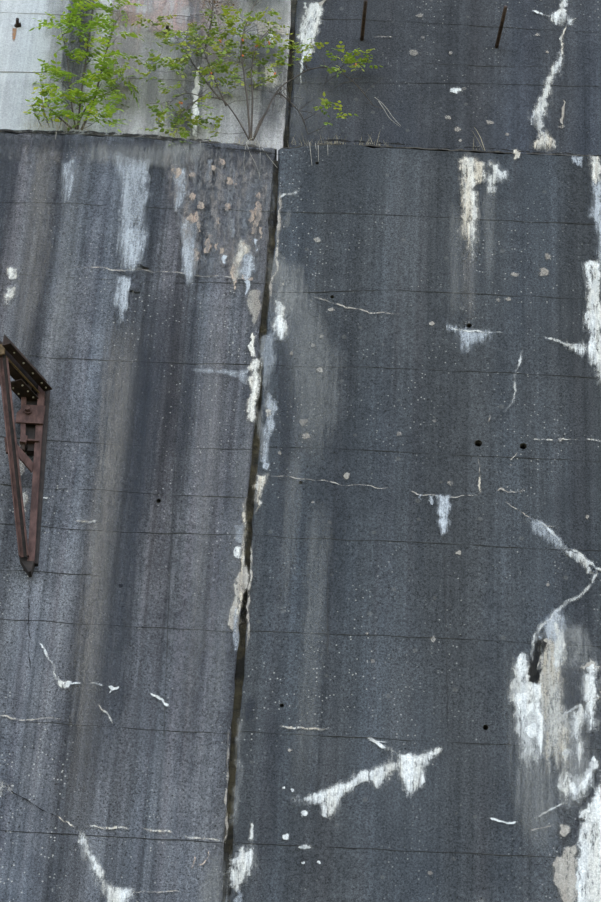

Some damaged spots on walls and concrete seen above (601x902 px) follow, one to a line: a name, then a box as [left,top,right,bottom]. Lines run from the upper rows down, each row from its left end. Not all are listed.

damp [116,149,163,267]
efflorescence [459,157,506,247]
efflorescence [592,156,601,232]
damp [5,267,17,302]
damp [115,278,130,312]
efflorescence [273,301,287,339]
efflorescence [568,260,601,372]
crack [414,468,601,593]
spalling [528,626,550,684]
crack [532,609,564,643]
efflorescence [509,613,601,766]
efflorescence [553,756,601,902]